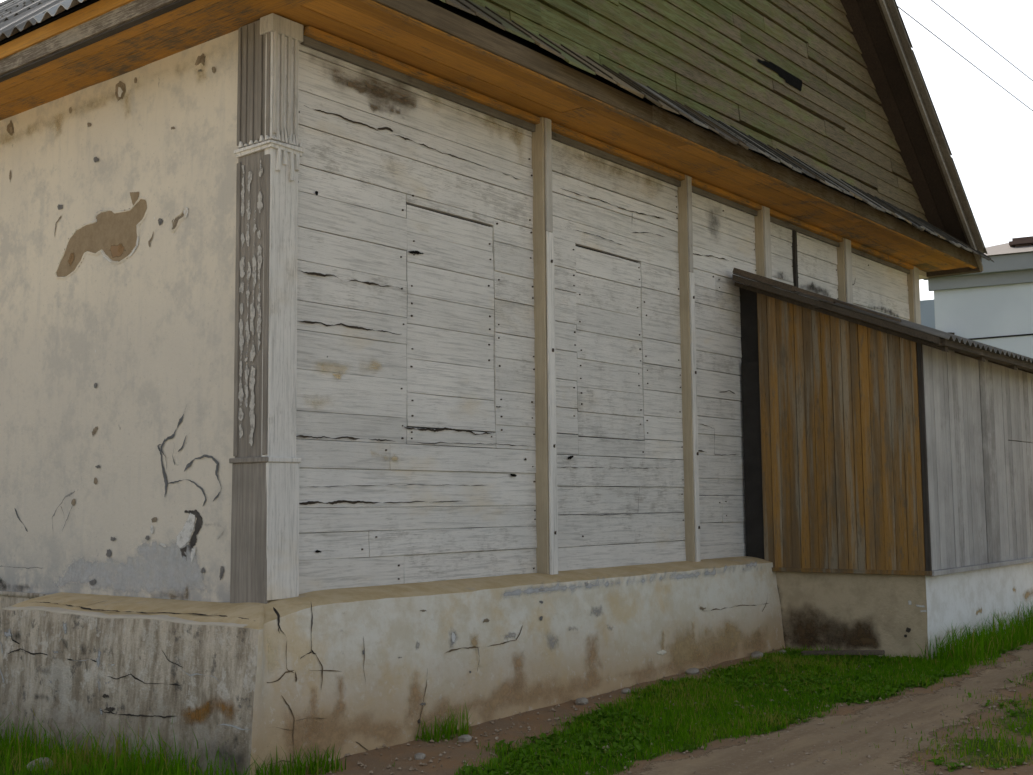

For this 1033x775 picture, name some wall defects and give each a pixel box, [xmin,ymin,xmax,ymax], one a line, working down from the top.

damp [333,69,414,114]
peeling [55,192,189,280]
crack [157,408,222,506]
crack [45,601,247,619]
damp [782,610,878,650]
crack [267,604,366,765]
crack [418,625,523,735]